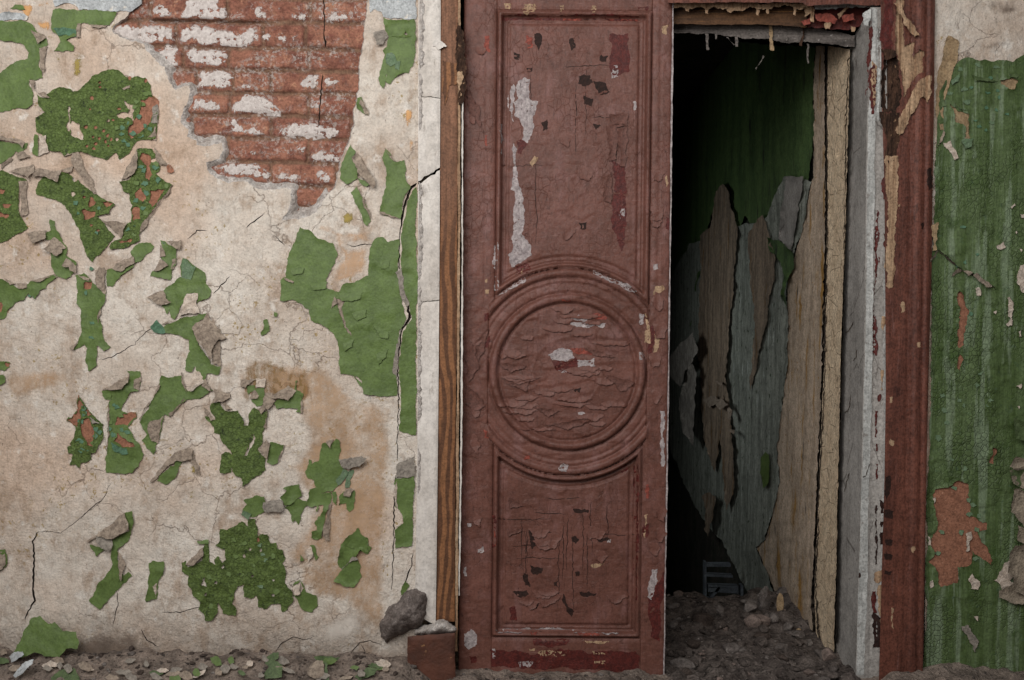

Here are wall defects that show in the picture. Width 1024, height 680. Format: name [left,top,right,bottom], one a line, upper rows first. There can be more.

crack [25,483,111,619]
flaking render [0,0,418,621]
crack [316,74,324,127]
crack [321,0,329,47]
damp [275,371,386,595]
crack [391,306,413,589]
crack [398,183,417,269]
peeling [485,77,538,295]
peeling [639,42,815,593]
peeling [911,35,1024,672]